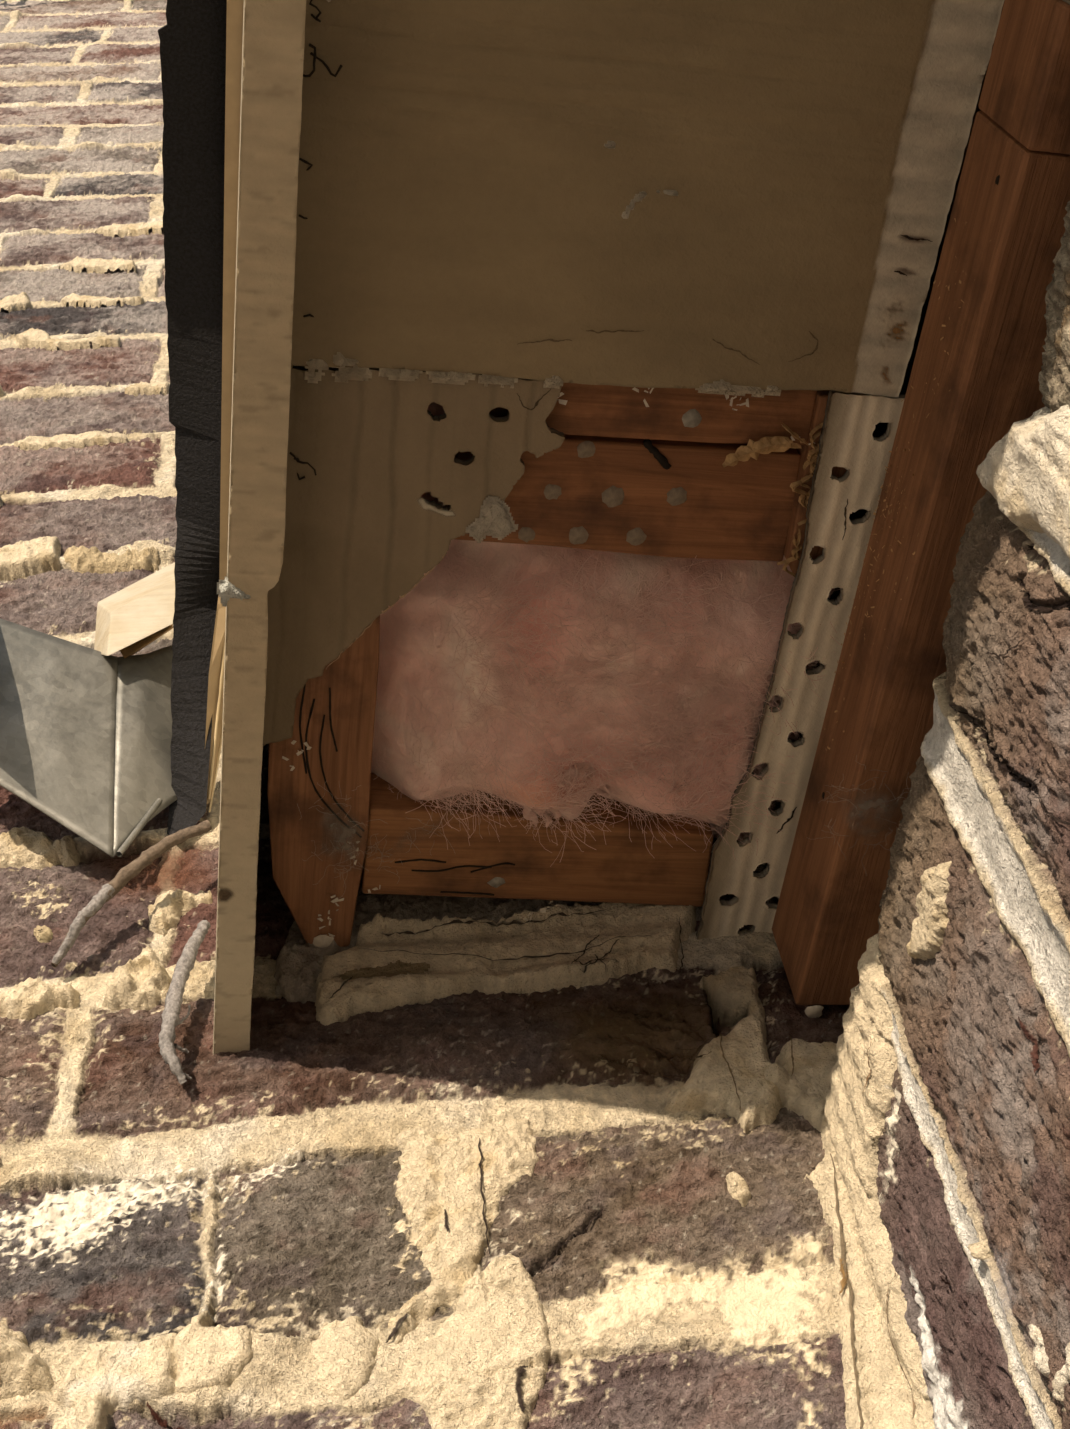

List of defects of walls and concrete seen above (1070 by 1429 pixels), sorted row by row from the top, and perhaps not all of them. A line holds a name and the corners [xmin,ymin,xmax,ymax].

peeling [304,352,518,388]
peeling [695,379,781,398]
spalling [419,499,454,515]
peeling [465,496,518,543]
peeling [217,577,251,607]
crack [985,545,1070,660]
crack [949,704,1070,825]
damp [0,1148,304,1274]
crack [478,1138,490,1254]